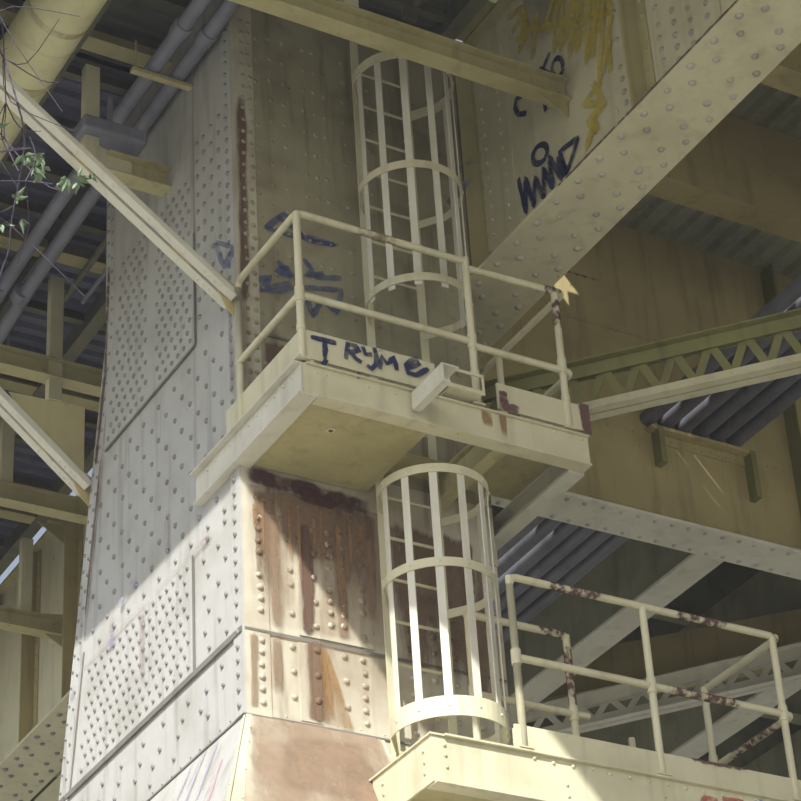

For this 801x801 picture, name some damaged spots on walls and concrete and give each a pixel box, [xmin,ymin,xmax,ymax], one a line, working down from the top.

rust [237,101,249,298]
rust [266,343,284,365]
rust [482,391,519,432]
rust [253,490,376,637]
rust [254,639,382,801]
rust [669,685,738,708]
rust [692,721,782,770]